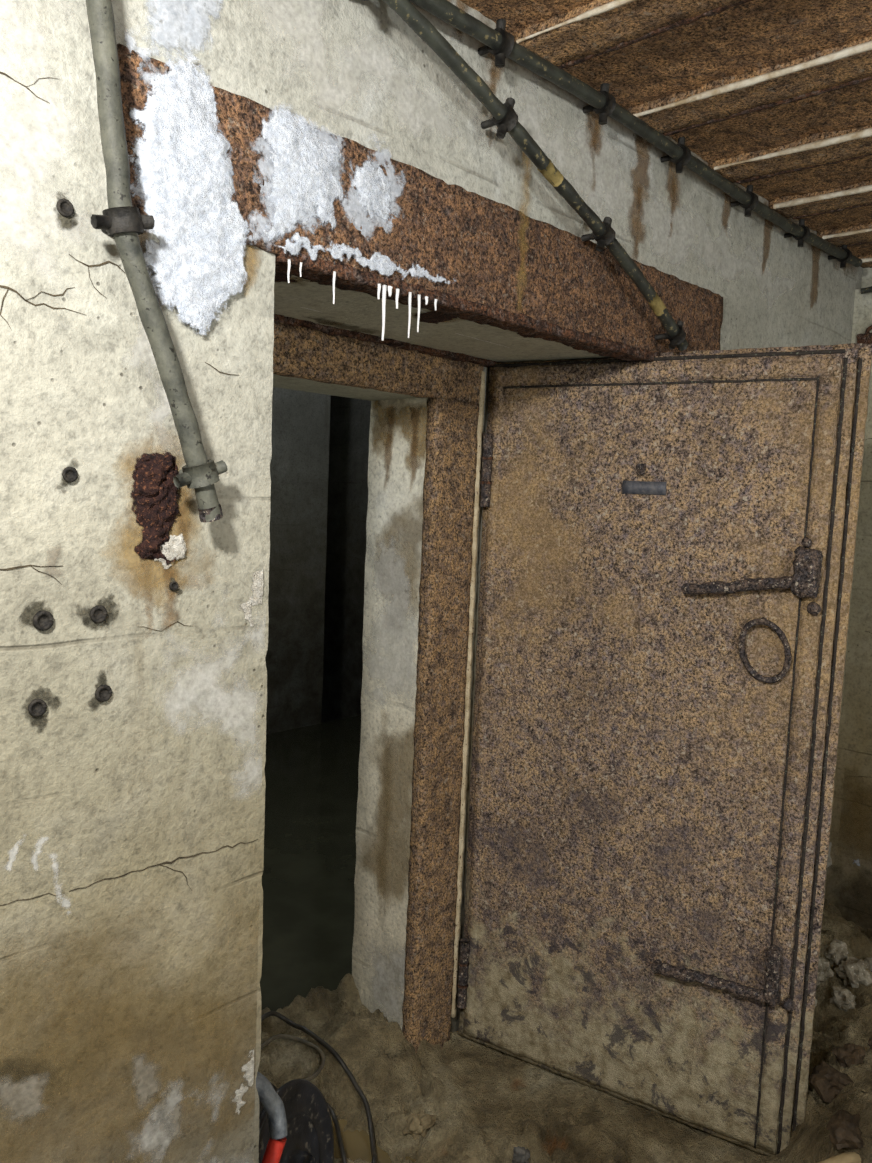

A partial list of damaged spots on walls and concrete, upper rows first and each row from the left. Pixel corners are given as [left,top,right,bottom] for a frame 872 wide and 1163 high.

crack [0,254,125,327]
damp [125,0,456,341]
corrosion [632,136,649,254]
corrosion [668,161,677,210]
corrosion [723,193,731,229]
corrosion [763,219,773,269]
corrosion [811,246,820,307]
corrosion [164,485,190,538]
corrosion [122,523,182,615]
crack [0,839,258,906]
damp [0,1065,47,1119]
damp [133,1056,181,1152]